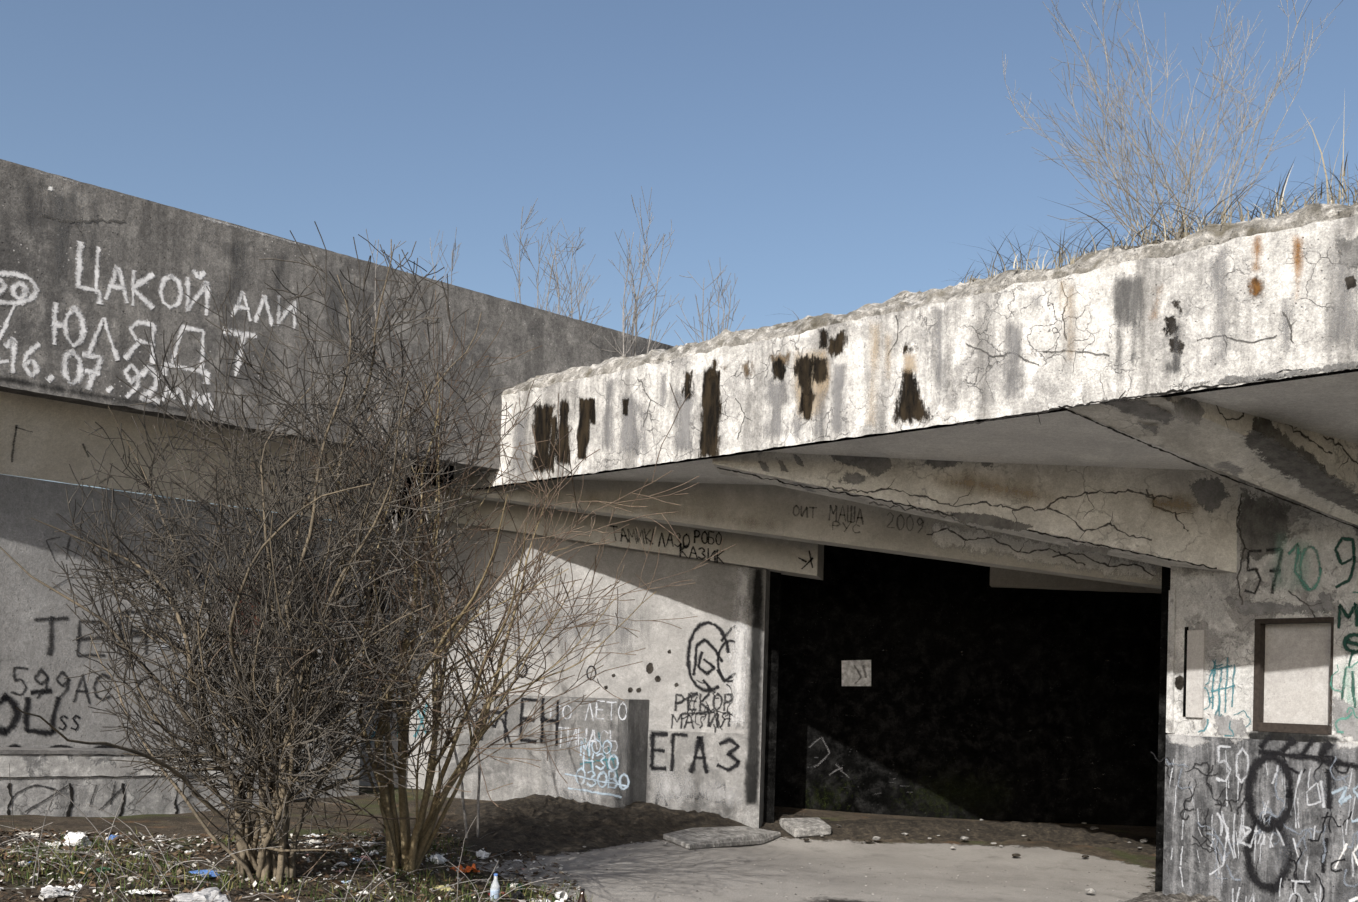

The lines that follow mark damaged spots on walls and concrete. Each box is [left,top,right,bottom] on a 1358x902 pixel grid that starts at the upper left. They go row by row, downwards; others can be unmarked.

corrosion [1248,239,1263,296]
damp [1114,277,1144,367]
damp [514,382,645,474]
damp [660,359,725,457]
damp [766,328,848,437]
crack [717,281,1358,605]